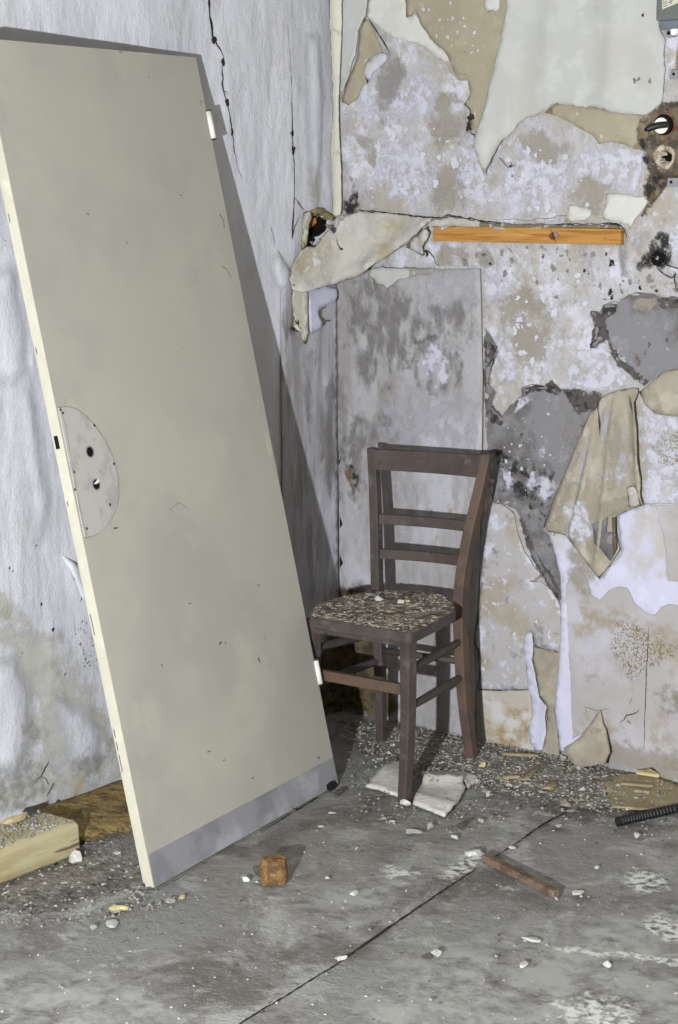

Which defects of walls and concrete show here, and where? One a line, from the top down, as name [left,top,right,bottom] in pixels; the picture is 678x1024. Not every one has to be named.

crack [208,0,240,173]
crack [288,36,303,239]
flaking render [342,0,506,135]
peeling [398,127,479,203]
flaking render [425,102,678,230]
spalling [307,215,327,246]
spalling [462,249,515,282]
leakage [406,336,462,390]
spalling [483,246,678,601]